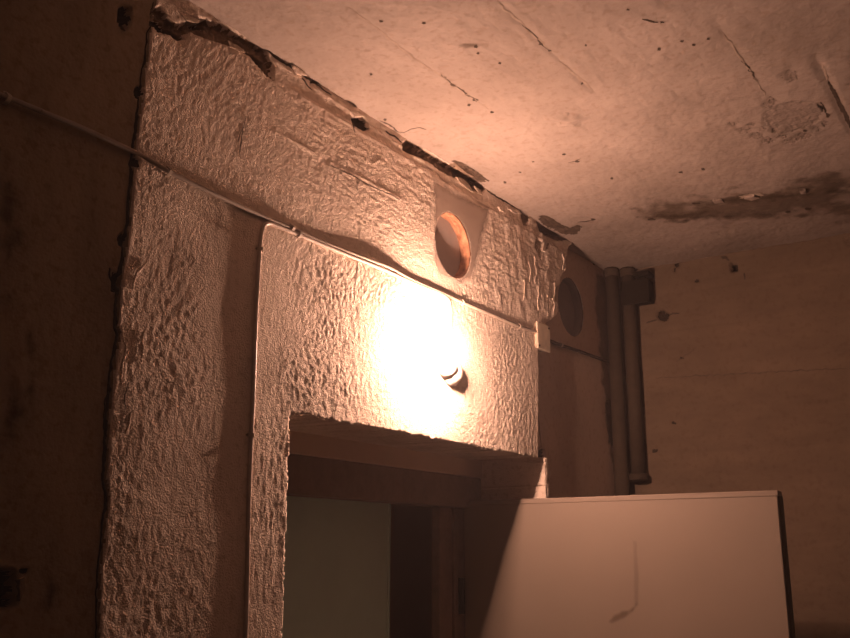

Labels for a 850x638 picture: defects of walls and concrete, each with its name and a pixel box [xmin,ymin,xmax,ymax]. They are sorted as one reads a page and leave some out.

spalling [149,9,274,81]
spalling [350,112,369,132]
crack [350,8,494,113]
crack [496,0,593,91]
crack [724,34,766,97]
spalling [728,97,830,145]
crack [822,65,850,128]
spalling [385,131,596,310]
water stain [655,173,850,219]